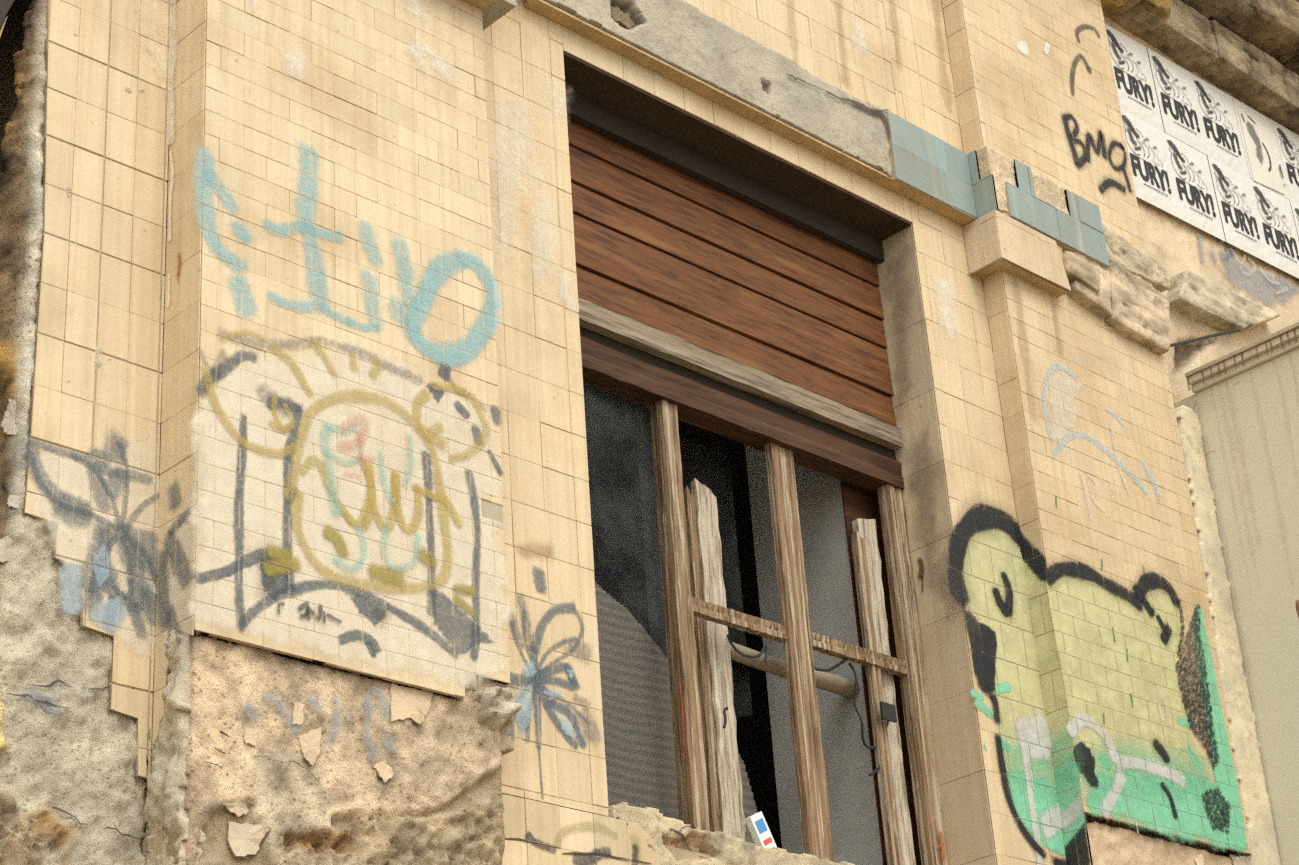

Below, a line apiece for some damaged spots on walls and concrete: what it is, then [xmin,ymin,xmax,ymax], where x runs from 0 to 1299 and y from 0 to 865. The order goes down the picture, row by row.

spalling [610,6,637,30]
spalling [0,0,150,865]
peeling [389,684,433,725]
peeling [291,702,322,766]
peeling [372,760,394,783]
peeling [221,799,264,857]